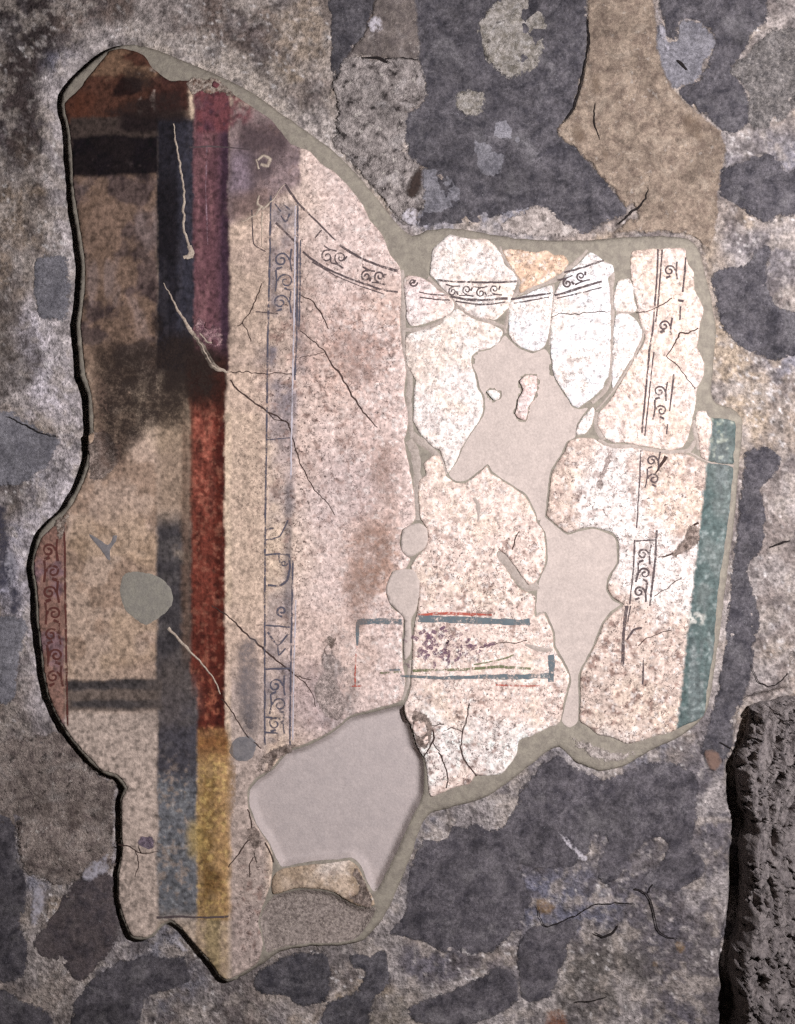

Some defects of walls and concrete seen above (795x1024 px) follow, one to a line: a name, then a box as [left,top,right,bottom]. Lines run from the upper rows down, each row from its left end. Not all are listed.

crack [564,19,600,139]
crack [618,176,650,225]
crack [188,294,378,515]
crack [400,246,734,522]
spalling [596,451,612,489]
crack [212,606,316,707]
flaking render [536,517,620,727]
flaking render [247,636,433,953]
crack [424,703,477,788]
crack [537,884,677,939]